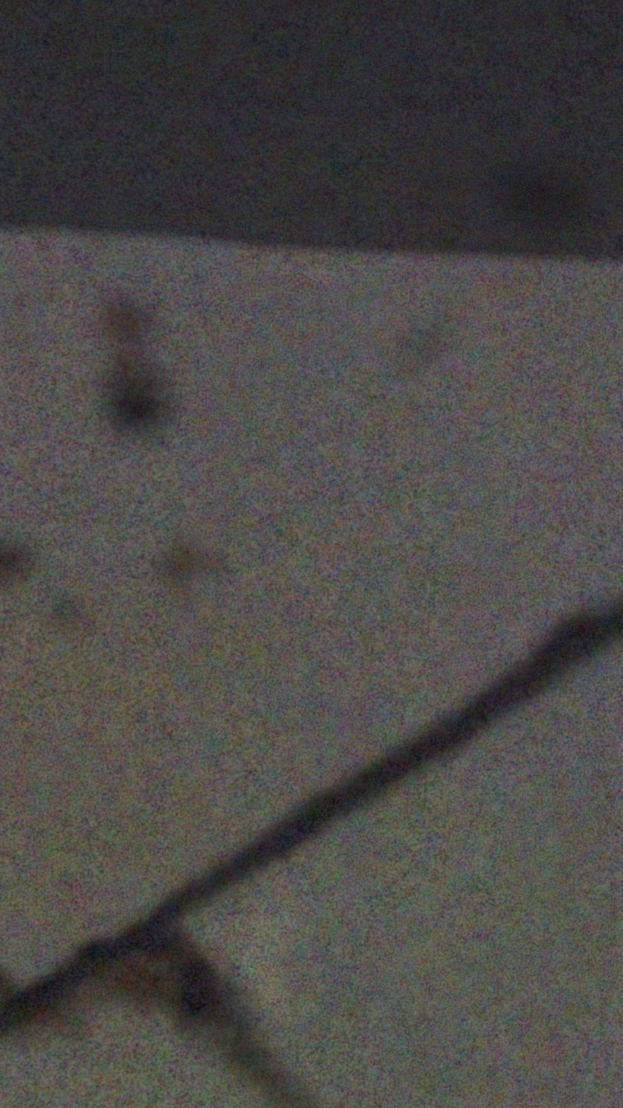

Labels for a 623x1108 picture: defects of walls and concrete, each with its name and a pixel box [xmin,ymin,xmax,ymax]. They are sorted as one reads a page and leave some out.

crack [0,602,623,1078]